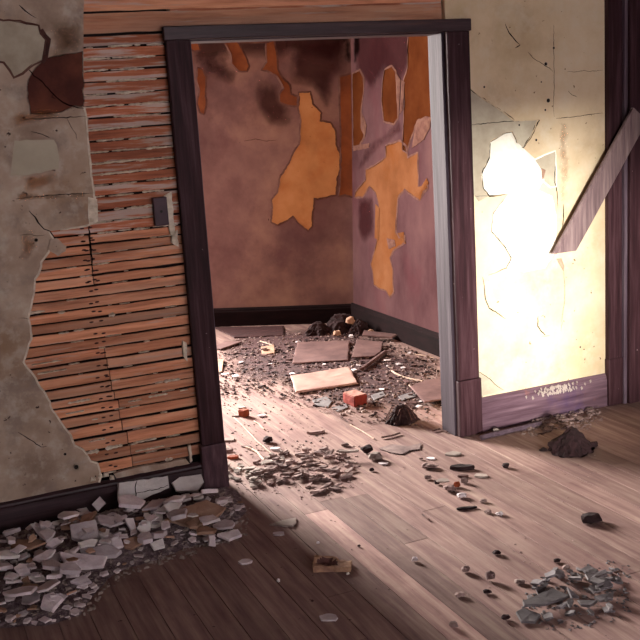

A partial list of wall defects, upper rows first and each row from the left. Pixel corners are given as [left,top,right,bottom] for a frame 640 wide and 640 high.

crack [505,24,554,68]
peeling [396,73,405,116]
peeling [9,137,62,178]
peeling [353,113,370,151]
peeling [412,116,431,148]
peeling [471,88,538,203]
peeling [535,150,557,188]
flaking render [23,106,200,483]